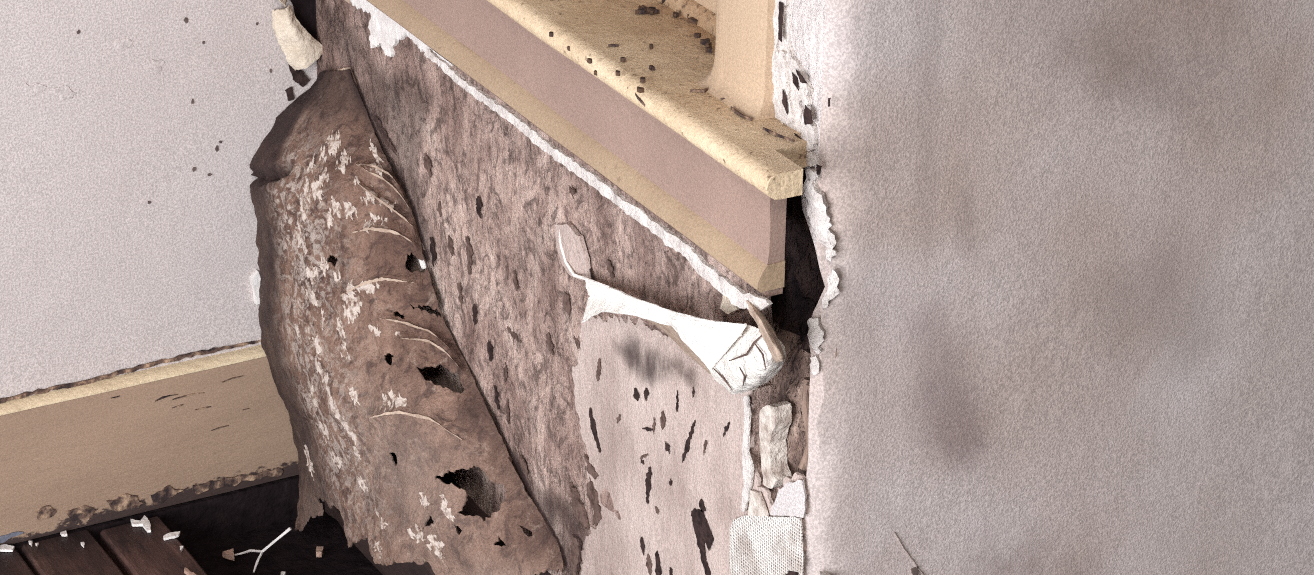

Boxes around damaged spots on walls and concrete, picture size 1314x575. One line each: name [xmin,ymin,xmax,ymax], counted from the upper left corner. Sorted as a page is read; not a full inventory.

flaking render [256,0,323,101]
flaking render [249,270,261,305]
flaking render [423,0,839,575]
spalling [35,467,283,540]